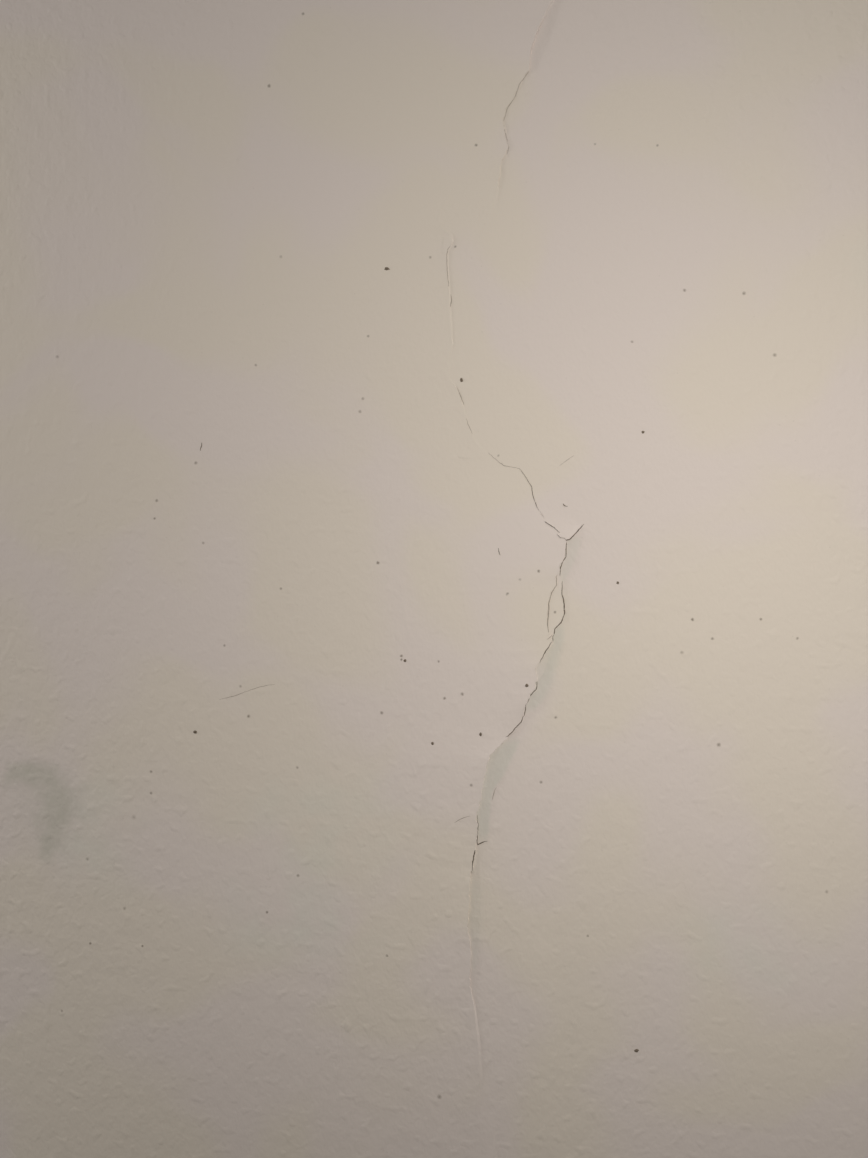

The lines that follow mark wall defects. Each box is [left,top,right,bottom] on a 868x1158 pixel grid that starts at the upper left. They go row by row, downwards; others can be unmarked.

peeling [366,457,584,1135]
crack [491,455,584,540]